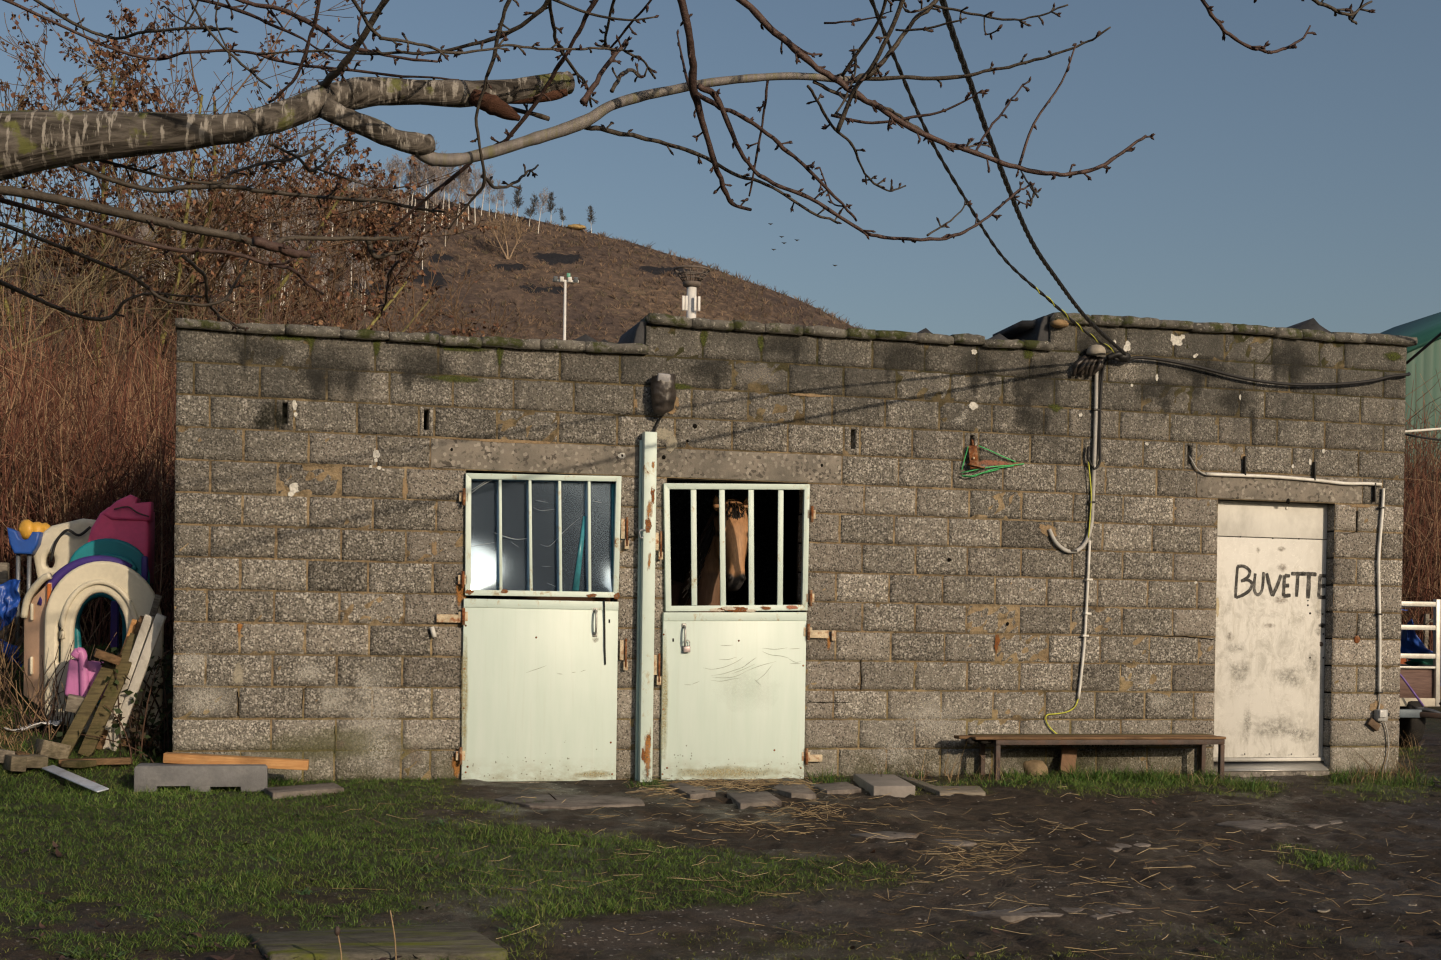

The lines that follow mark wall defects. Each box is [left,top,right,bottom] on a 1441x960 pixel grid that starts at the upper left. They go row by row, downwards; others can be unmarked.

rust [645,487,655,533]